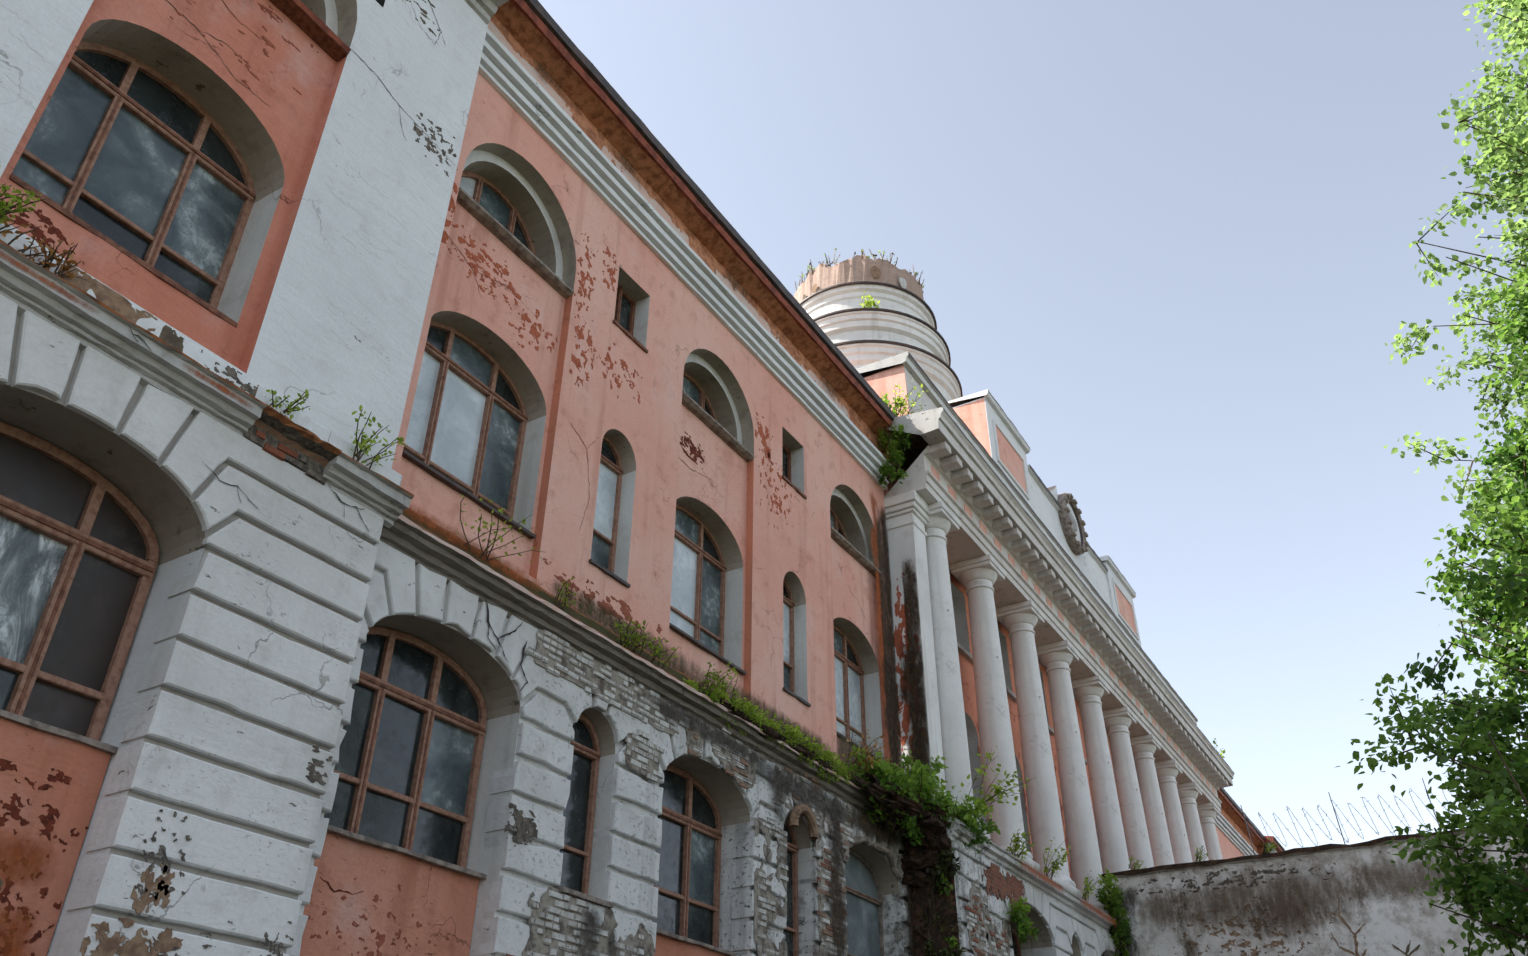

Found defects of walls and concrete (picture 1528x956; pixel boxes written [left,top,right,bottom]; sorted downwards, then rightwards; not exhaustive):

spalling [2,200,266,397]
peeling [413,112,642,404]
leakage [555,511,930,774]
peeling [0,758,88,956]
spalling [80,809,192,956]
peeling [258,894,449,956]
spalling [504,803,538,845]
spalling [494,887,656,956]
spalling [527,629,854,956]
leakage [906,880,916,956]
spalling [965,862,1028,956]
leakage [1107,859,1475,956]